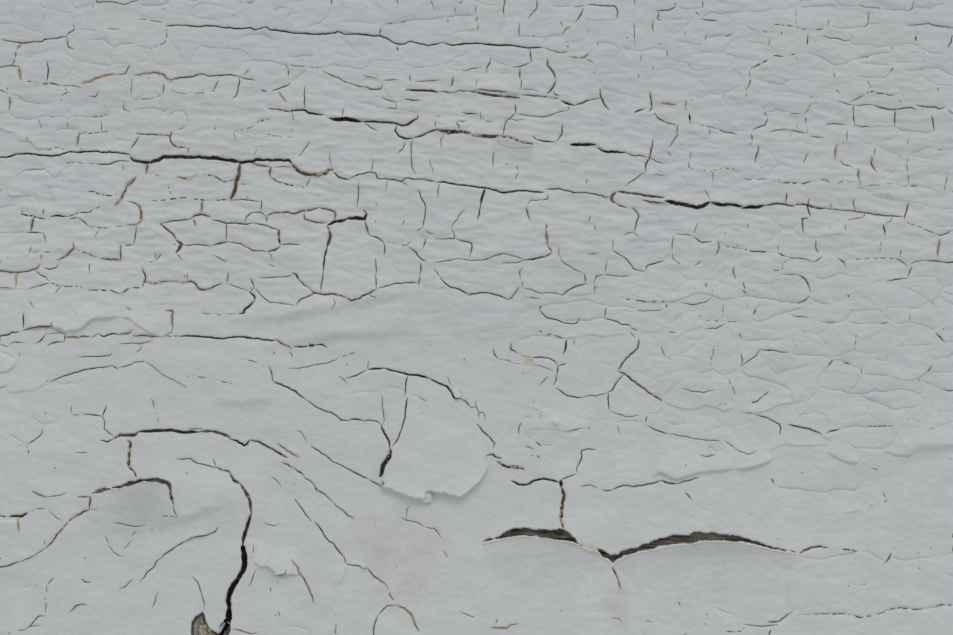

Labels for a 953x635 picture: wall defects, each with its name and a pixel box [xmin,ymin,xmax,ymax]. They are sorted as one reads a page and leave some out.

crack [0,2,953,457]
crack [120,528,218,607]
crack [0,401,353,568]
peeling [199,620,216,635]
crack [182,458,314,635]
crack [295,500,419,635]
crack [240,359,828,586]
crack [727,611,793,634]